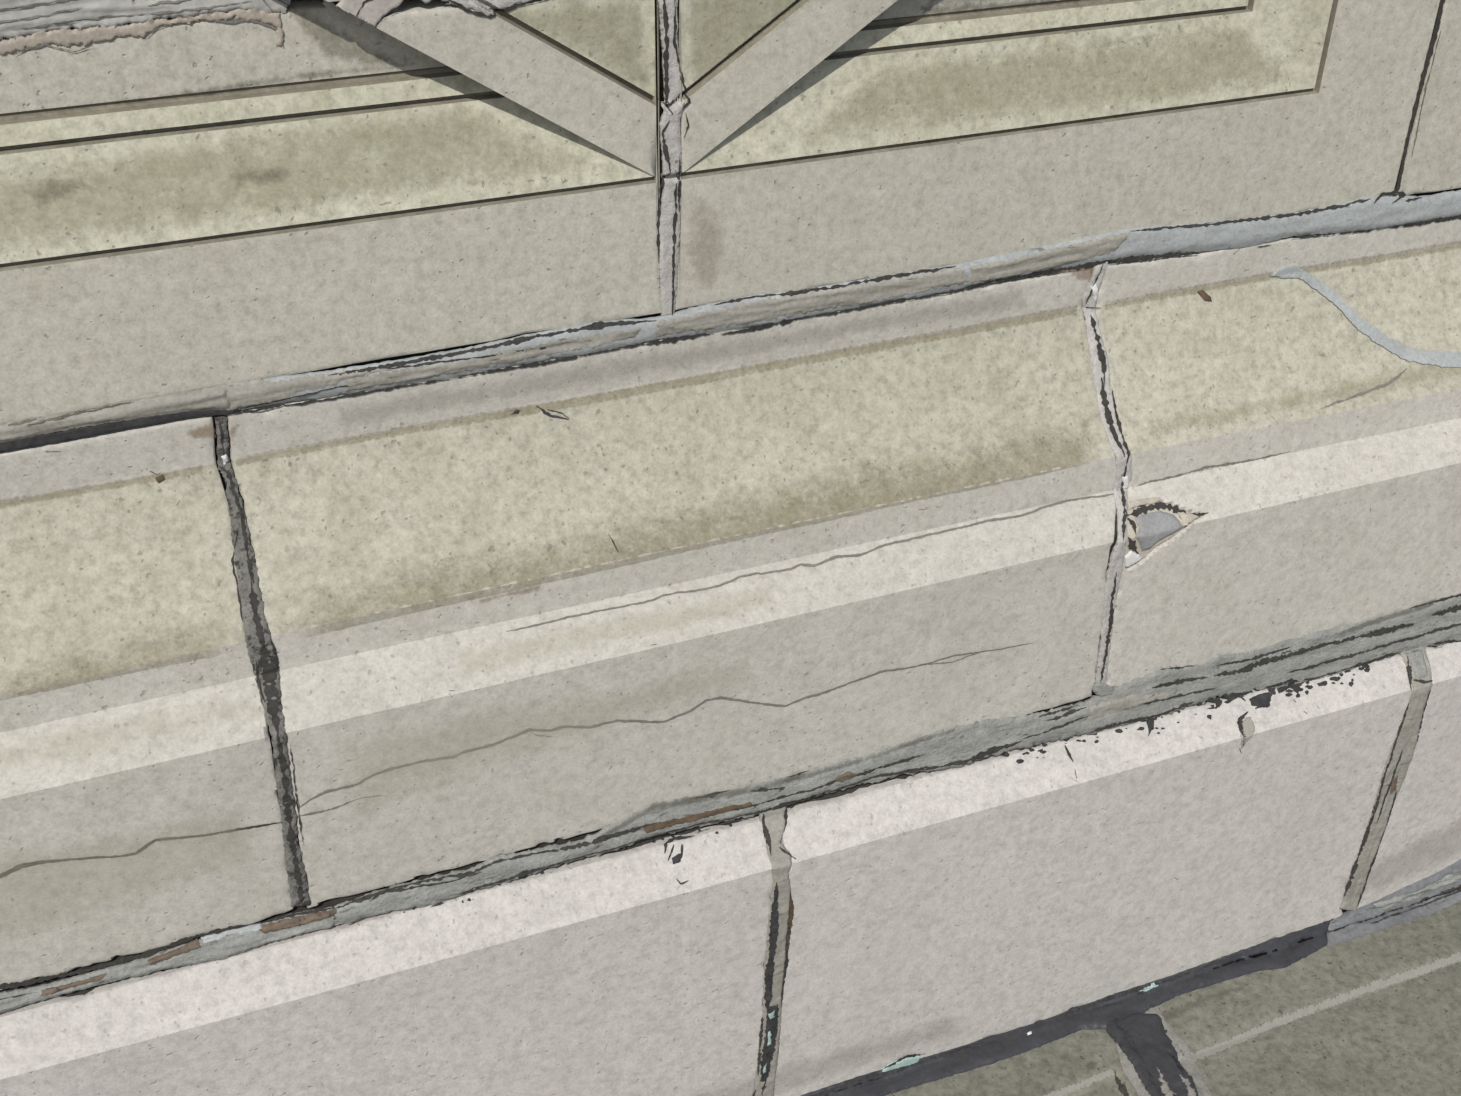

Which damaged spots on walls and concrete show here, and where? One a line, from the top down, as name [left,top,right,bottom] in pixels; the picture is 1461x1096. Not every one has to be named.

peeling [0,0,291,56]
crack [1270,265,1461,410]
crack [506,451,1291,632]
spalling [1124,497,1209,568]
crack [0,643,1030,878]
peeling [1003,664,1370,787]
rust [41,973,107,996]
rust [147,938,201,965]
rust [259,907,337,934]